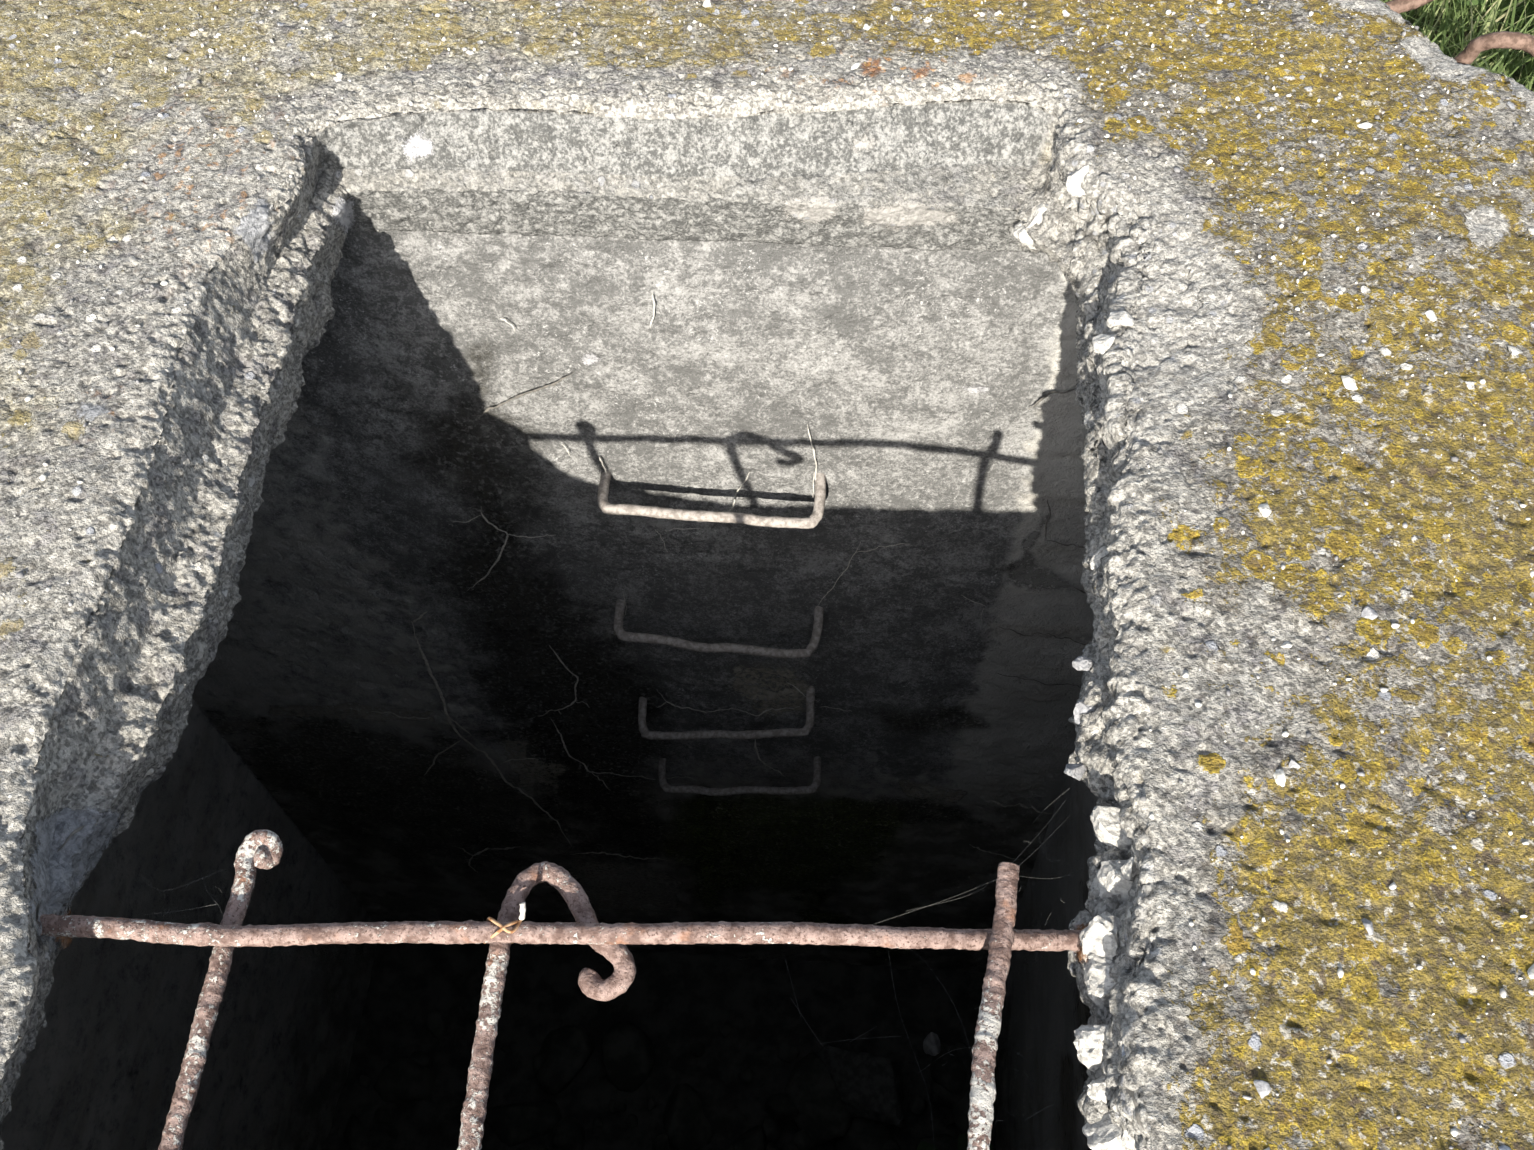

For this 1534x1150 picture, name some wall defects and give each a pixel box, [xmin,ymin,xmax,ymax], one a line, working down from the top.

water stain [412,398,725,922]
spalling [28,807,124,952]
water stain [739,945,818,960]
water stain [797,909,853,924]
water stain [842,945,904,962]
spalling [1067,801,1159,1150]